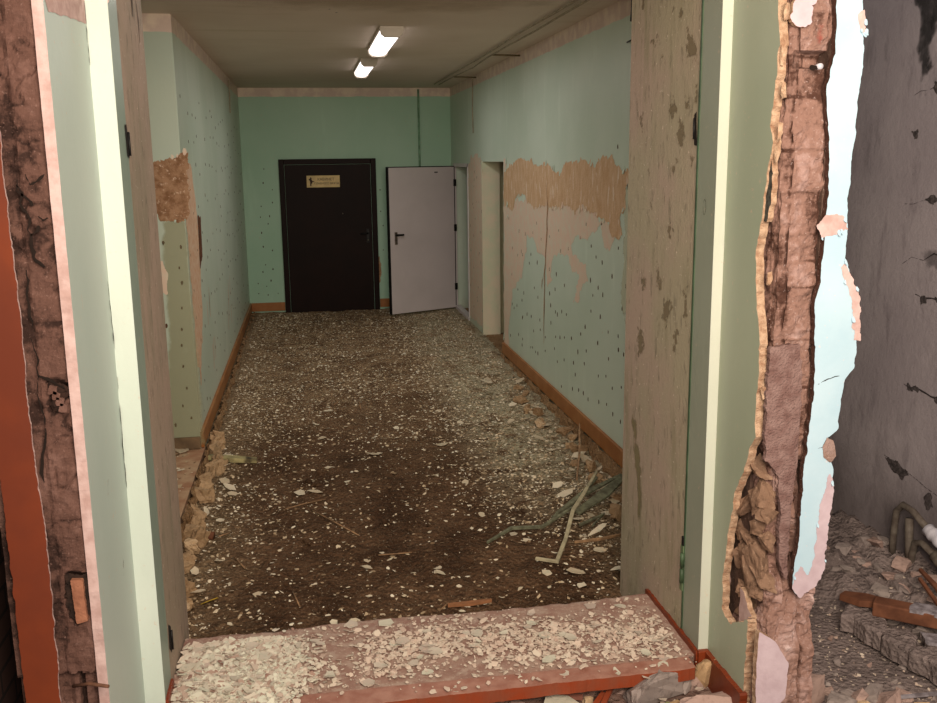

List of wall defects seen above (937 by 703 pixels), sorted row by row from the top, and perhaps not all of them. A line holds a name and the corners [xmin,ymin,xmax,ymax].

flaking render [153,135,227,380]
peeling [503,145,629,346]
crack [914,195,937,205]
crack [915,294,937,304]
spalling [821,438,836,462]
crack [904,383,937,404]
spalling [733,453,779,615]
peeling [792,474,834,598]